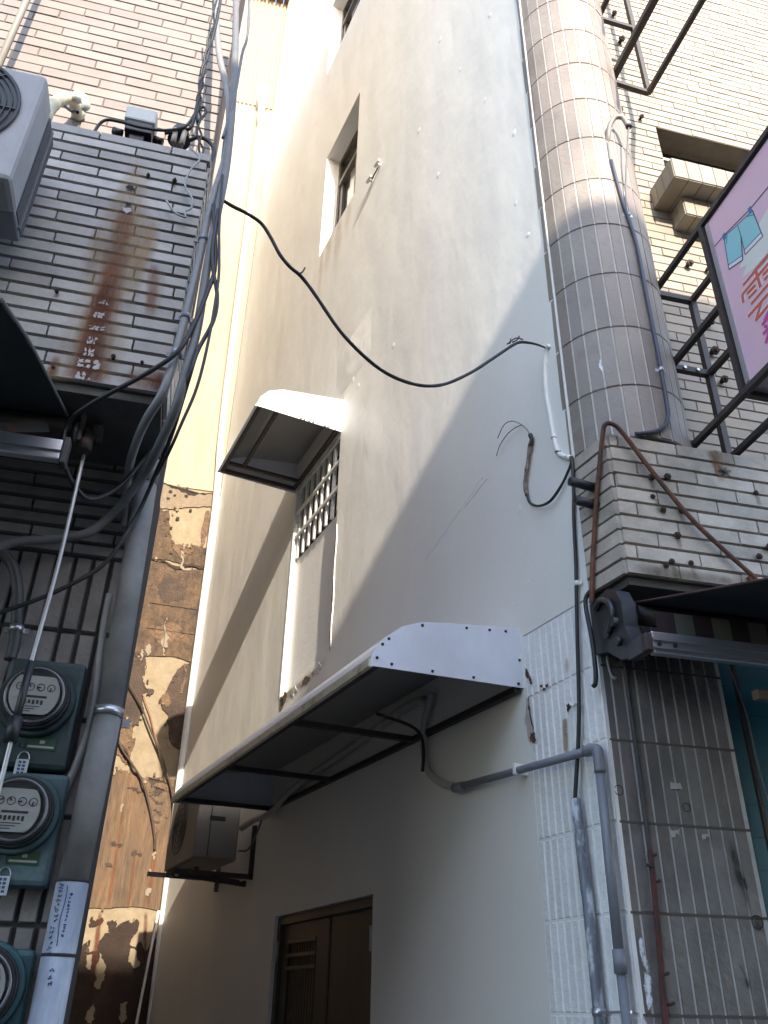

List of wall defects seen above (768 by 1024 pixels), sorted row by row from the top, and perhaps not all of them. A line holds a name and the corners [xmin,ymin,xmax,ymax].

rust [74,213,136,379]
peeling [89,483,221,916]